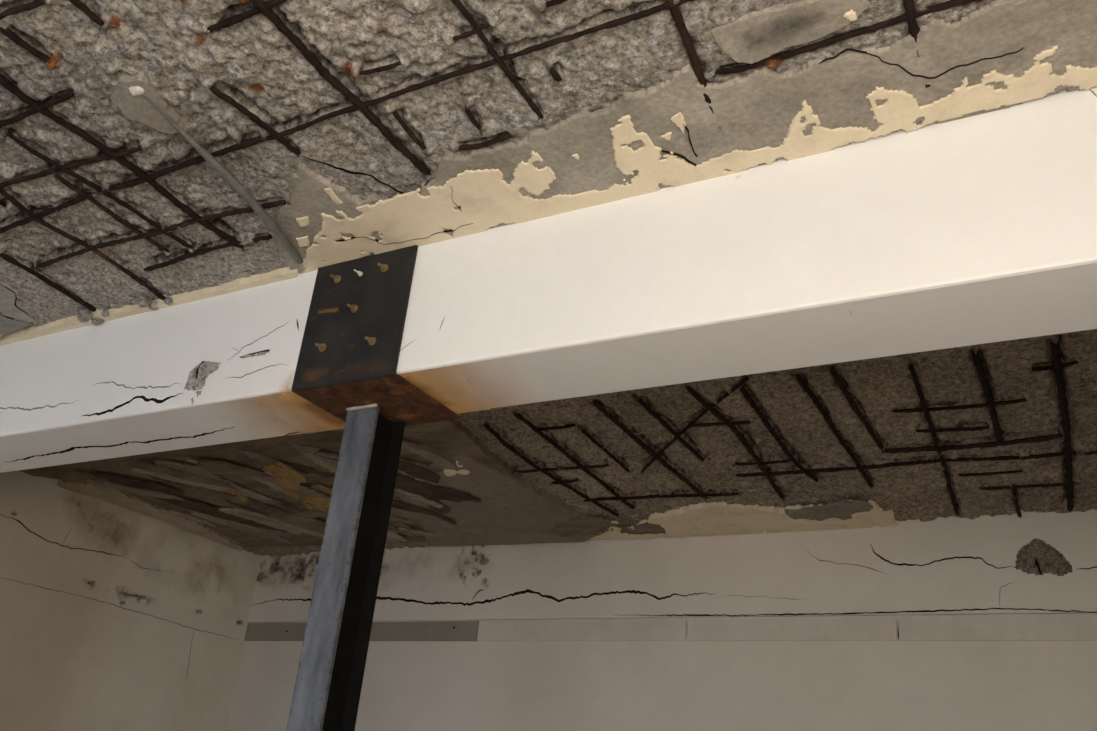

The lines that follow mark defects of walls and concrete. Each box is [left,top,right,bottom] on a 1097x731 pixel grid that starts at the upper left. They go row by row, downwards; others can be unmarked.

rust [107,16,121,30]
crack [819,48,1023,79]
spalling [0,0,1097,346]
crack [227,321,299,378]
crack [0,381,183,416]
spalling [184,361,221,404]
rust [398,368,486,414]
crack [4,427,233,463]
spalling [385,329,1097,550]
peeling [18,429,344,557]
spalling [1014,539,1073,576]
crack [376,544,1097,640]